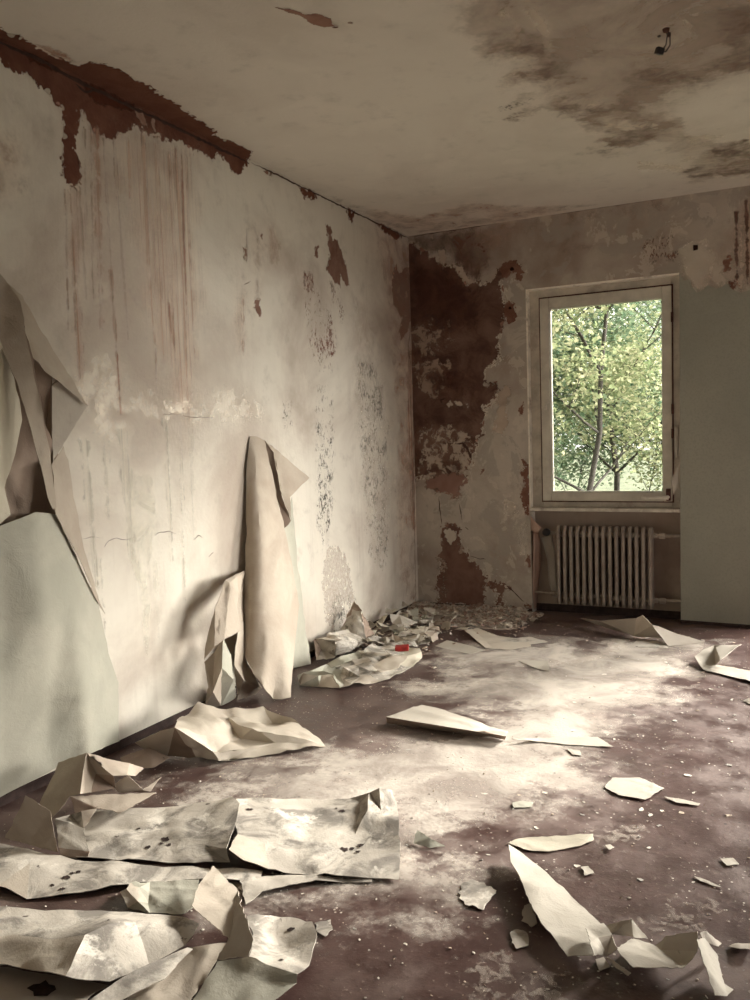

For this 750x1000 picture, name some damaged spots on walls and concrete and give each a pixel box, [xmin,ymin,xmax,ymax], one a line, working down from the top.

peeling [0,27,251,191]
peeling [275,7,353,28]
damp [580,0,750,147]
damp [304,273,343,364]
peeling [314,224,349,288]
damp [315,389,334,546]
damp [358,362,388,564]
peeling [392,238,532,608]